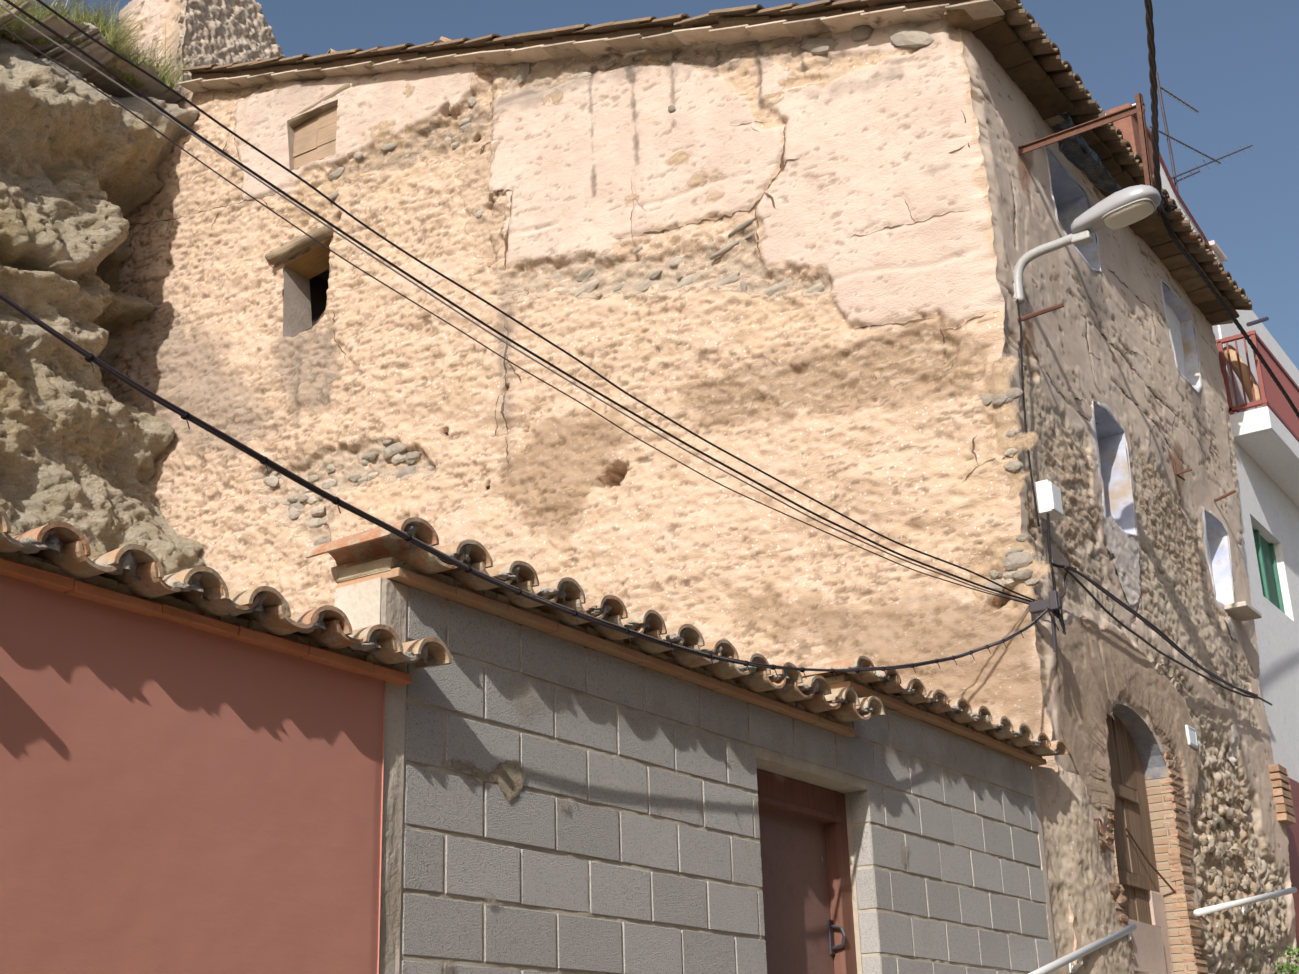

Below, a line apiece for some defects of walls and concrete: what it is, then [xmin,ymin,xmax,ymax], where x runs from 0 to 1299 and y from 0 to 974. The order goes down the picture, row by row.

crack [620,121,800,262]
crack [853,201,968,236]
crack [495,323,522,474]
spalling [443,761,524,801]